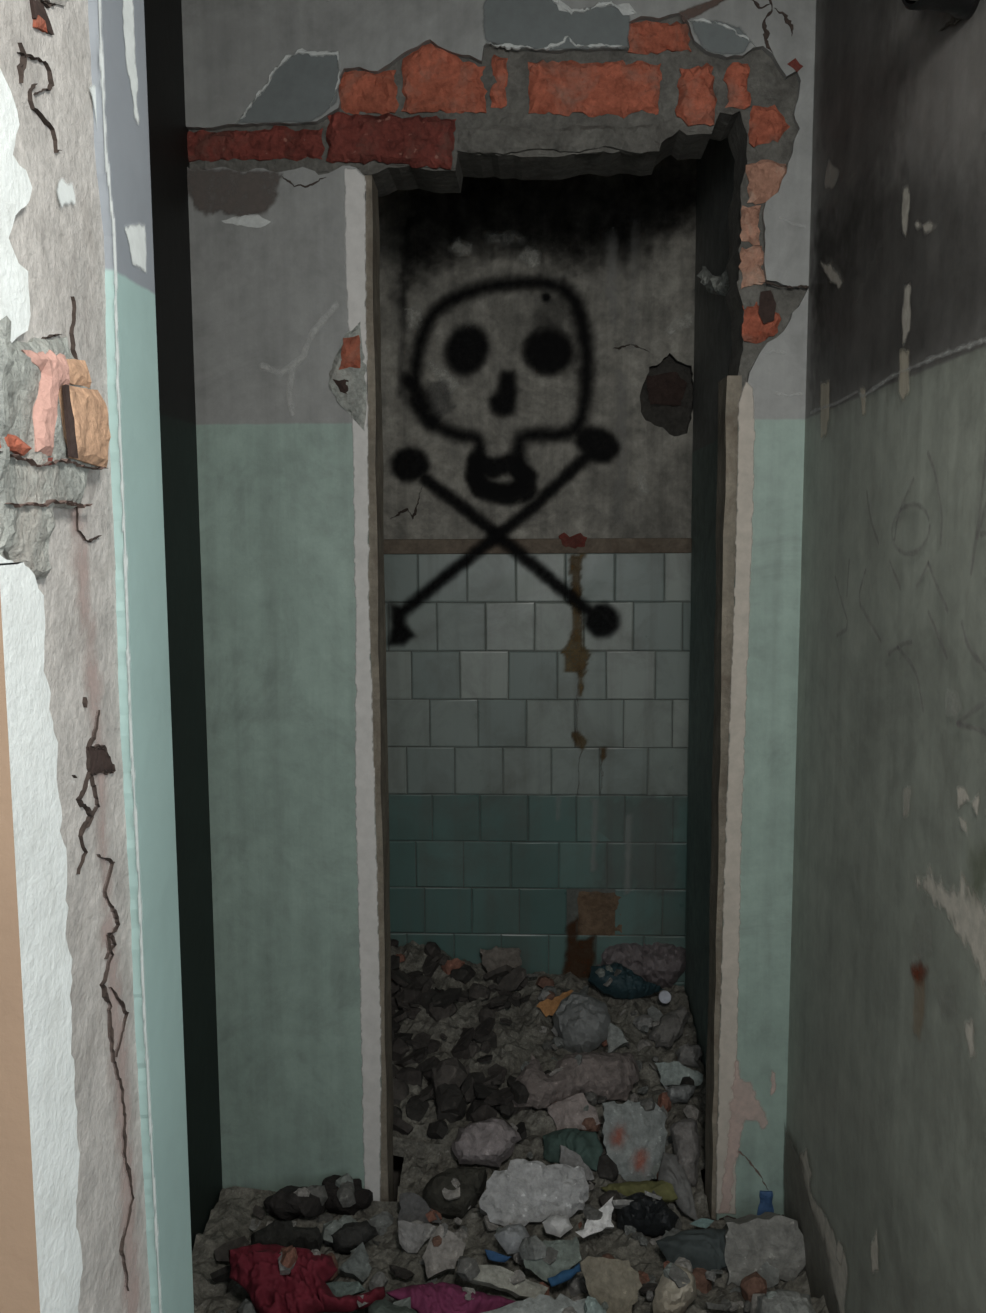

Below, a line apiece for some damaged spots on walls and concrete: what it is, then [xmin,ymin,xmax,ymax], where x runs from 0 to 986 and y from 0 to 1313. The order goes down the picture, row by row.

crack [17,0,62,153]
crack [752,0,794,53]
crack [41,296,78,360]
peeling [822,264,842,287]
crack [74,507,102,543]
flaking render [0,0,162,1313]
flaking render [187,0,807,1214]
rust [561,553,590,696]
rust [572,732,606,760]
crack [72,697,134,1291]
peeling [783,1128,848,1313]